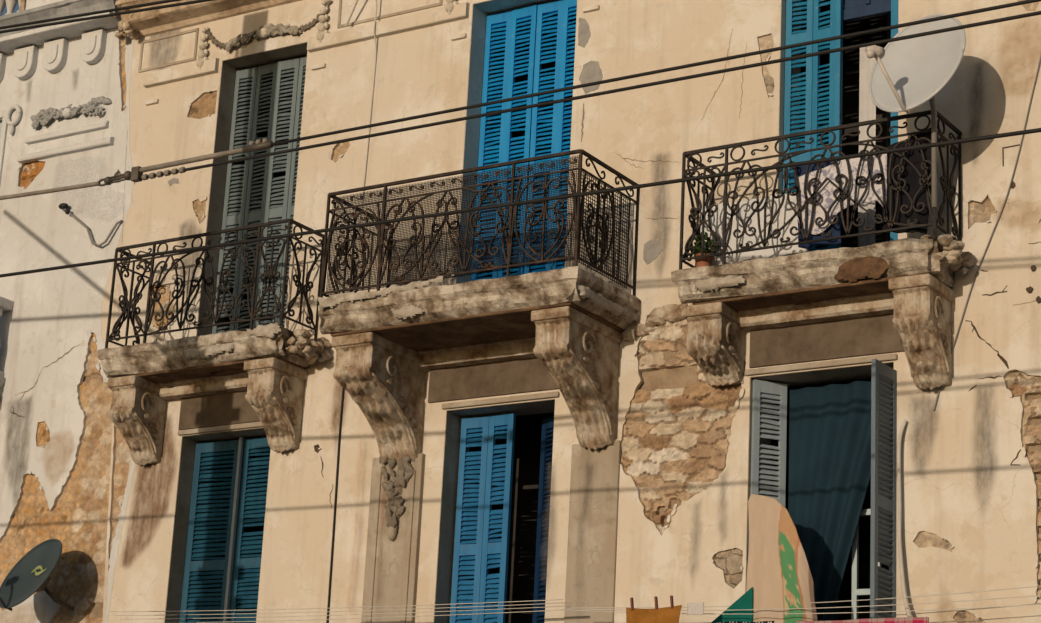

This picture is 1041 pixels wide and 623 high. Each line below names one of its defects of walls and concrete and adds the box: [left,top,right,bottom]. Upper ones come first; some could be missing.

flaking render [758,34,774,97]
spalling [18,161,45,188]
spalling [969,193,997,227]
spalling [919,234,974,274]
crack [10,343,81,417]
spalling [578,285,745,534]
spalling [0,333,131,623]
spalling [1005,370,1041,603]
spalling [914,531,954,552]
spalling [712,548,743,588]
spalling [954,611,985,623]